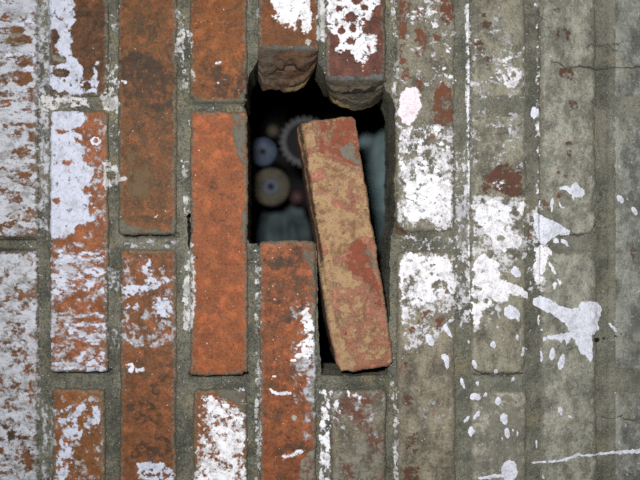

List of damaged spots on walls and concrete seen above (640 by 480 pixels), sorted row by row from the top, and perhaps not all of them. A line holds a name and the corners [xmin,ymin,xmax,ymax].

crack [551,36,640,70]